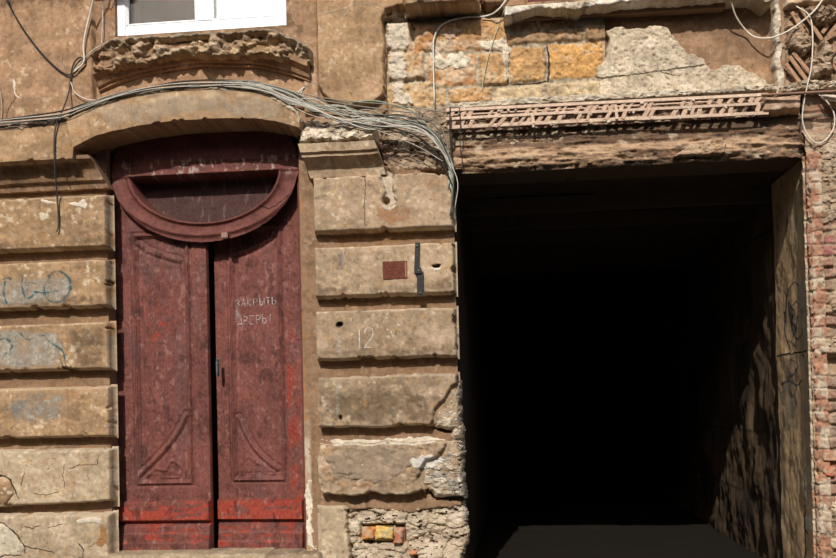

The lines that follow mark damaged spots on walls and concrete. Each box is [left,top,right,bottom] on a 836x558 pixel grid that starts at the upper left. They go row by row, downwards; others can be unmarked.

spalling [384,9,775,117]
spalling [782,0,836,85]
spalling [454,124,607,151]
peeling [797,282,836,506]
crack [0,522,62,558]
crack [0,456,99,499]
peeling [304,480,317,550]
spalling [322,380,470,558]